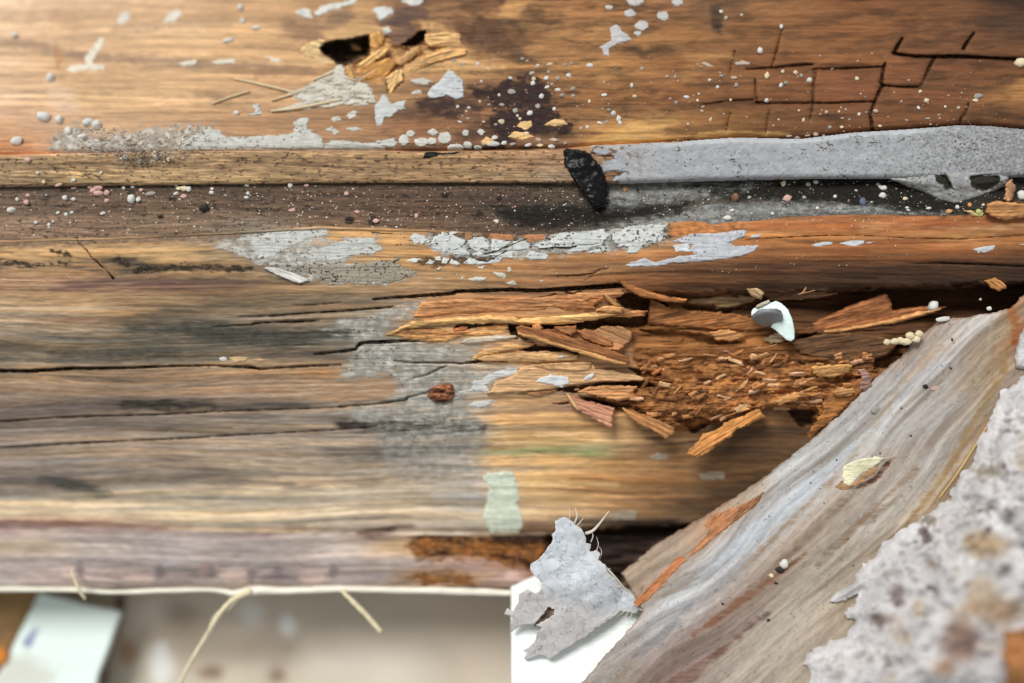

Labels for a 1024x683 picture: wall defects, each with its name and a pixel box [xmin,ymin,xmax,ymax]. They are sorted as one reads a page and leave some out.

peeling [178,65,534,152]
damp [416,74,574,149]
crack [717,30,1018,133]
peeling [251,221,762,286]
crack [0,339,508,448]
peeling [459,368,518,409]
peeling [536,374,570,388]
spalling [582,281,1024,434]